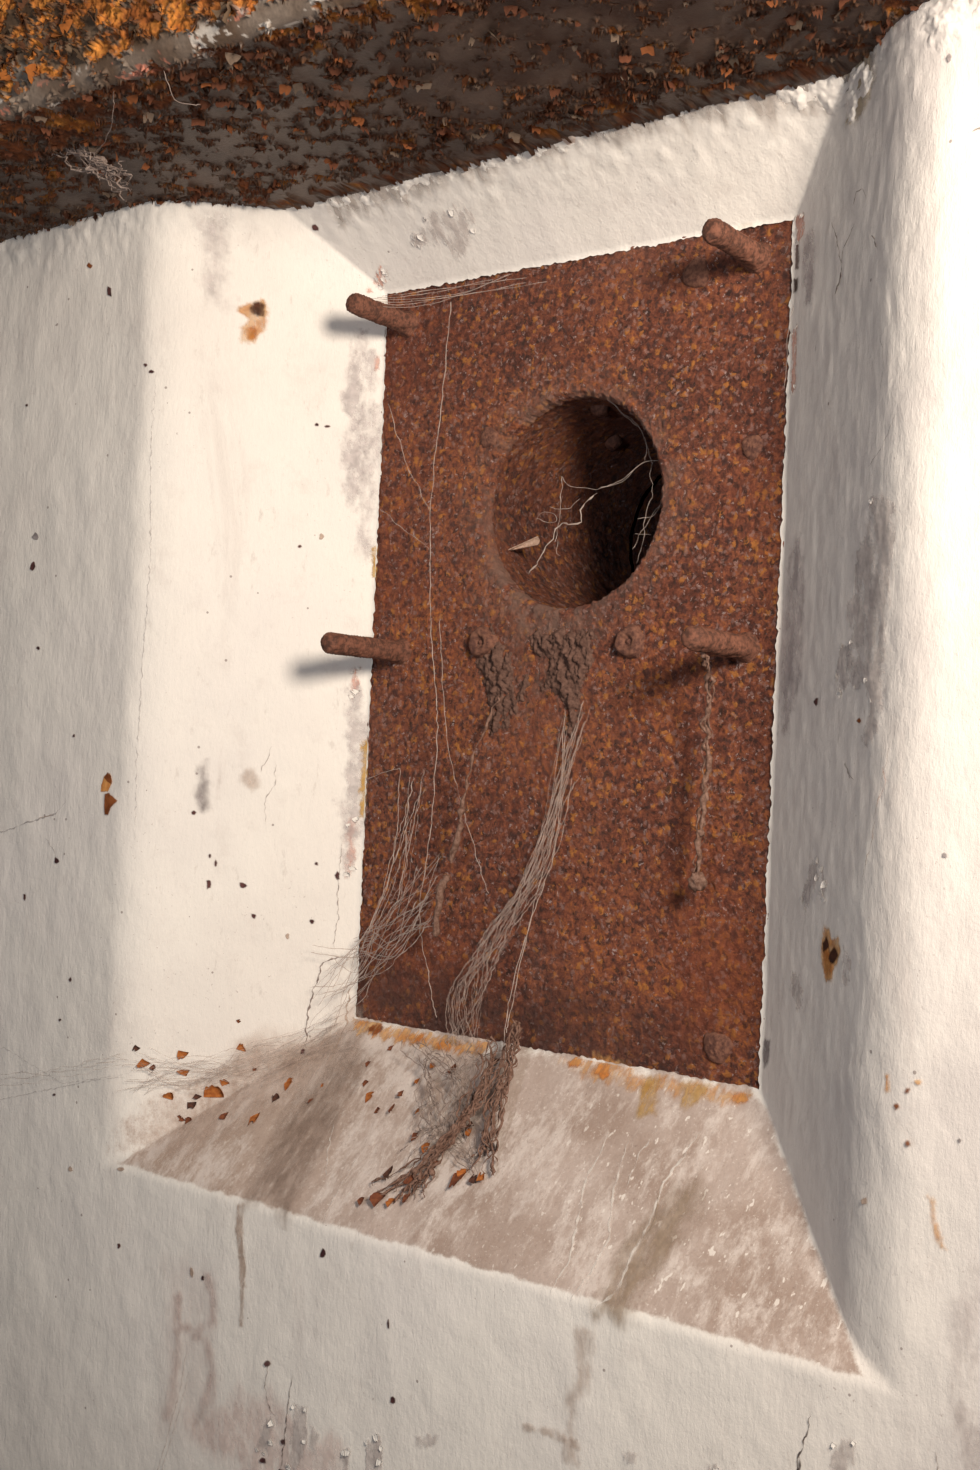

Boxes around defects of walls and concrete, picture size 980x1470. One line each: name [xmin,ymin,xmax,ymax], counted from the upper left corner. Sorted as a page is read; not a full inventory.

rust [531,0,861,103]
rust [0,0,602,239]
rust [239,300,267,341]
rust [821,928,840,982]
rust [354,1021,488,1054]
rust [569,1056,751,1115]
water stain [236,1206,246,1301]
crack [797,1417,810,1470]